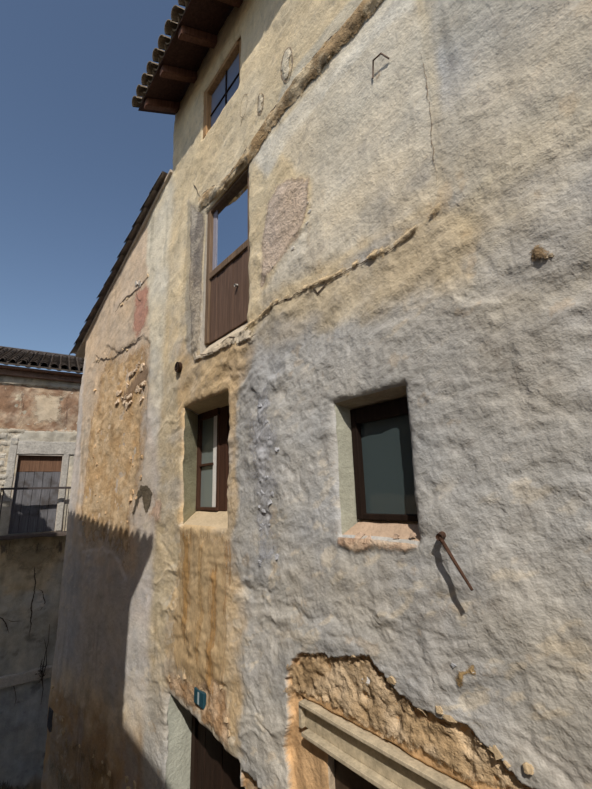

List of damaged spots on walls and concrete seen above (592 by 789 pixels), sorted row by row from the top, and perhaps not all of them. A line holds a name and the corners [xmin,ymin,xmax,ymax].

crack [419,51,437,181]
crack [93,334,143,372]
peeling [134,280,148,336]
crack [244,203,440,330]
spalling [530,245,554,261]
peeling [80,346,148,550]
crack [0,567,45,636]
peeling [284,653,534,789]